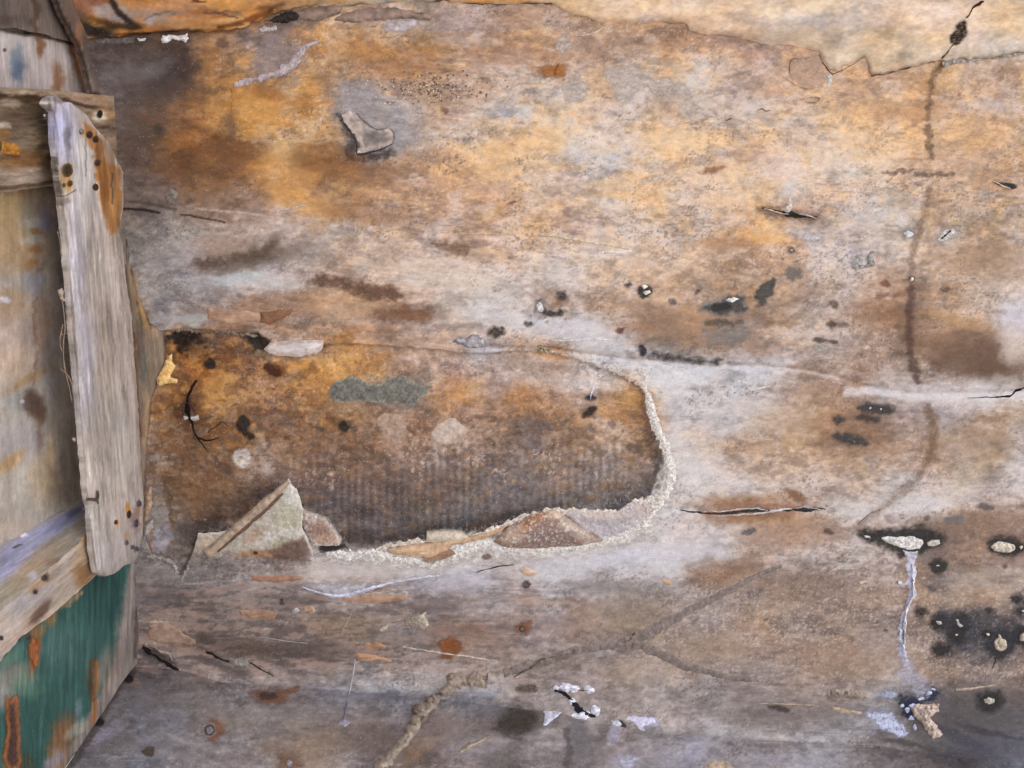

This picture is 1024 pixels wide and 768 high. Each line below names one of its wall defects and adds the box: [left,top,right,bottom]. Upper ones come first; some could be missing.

rust [540,64,565,80]
crack [819,43,955,77]
leakage [925,68,941,159]
spalling [341,111,395,156]
crack [760,197,817,220]
peeling [264,340,324,357]
leakage [906,284,922,384]
peeling [156,354,178,386]
crack [975,388,1024,398]
peeling [180,479,342,585]
peeling [494,508,606,549]
crack [681,504,826,519]